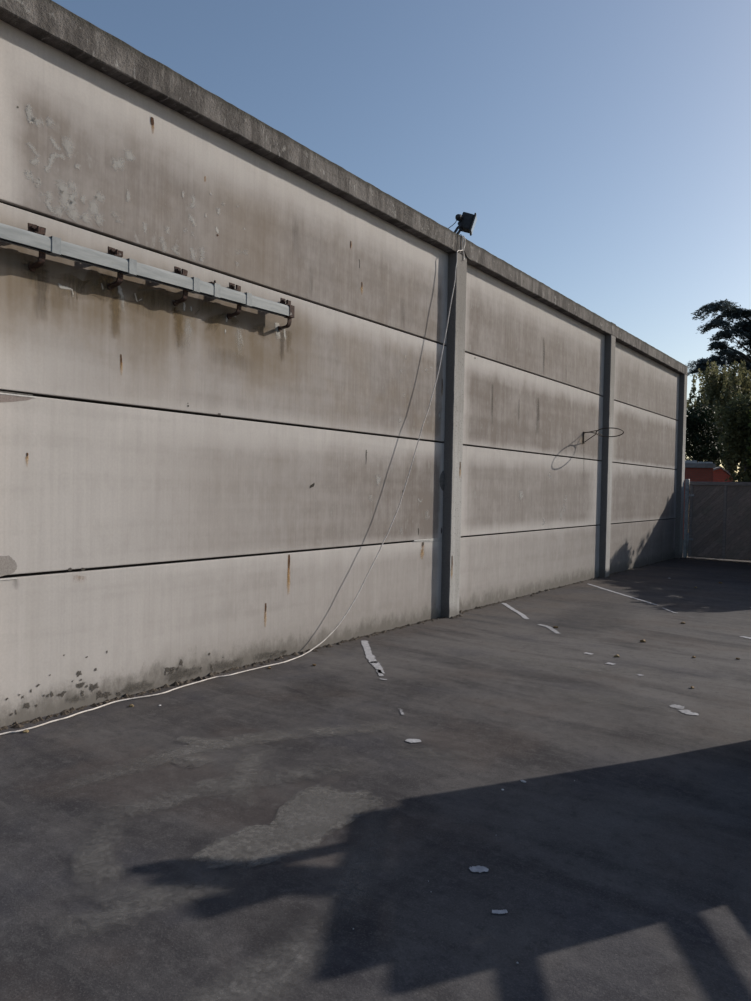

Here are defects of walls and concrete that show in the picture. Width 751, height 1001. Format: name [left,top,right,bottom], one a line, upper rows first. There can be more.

damp [164,653,236,681]
damp [5,671,151,715]